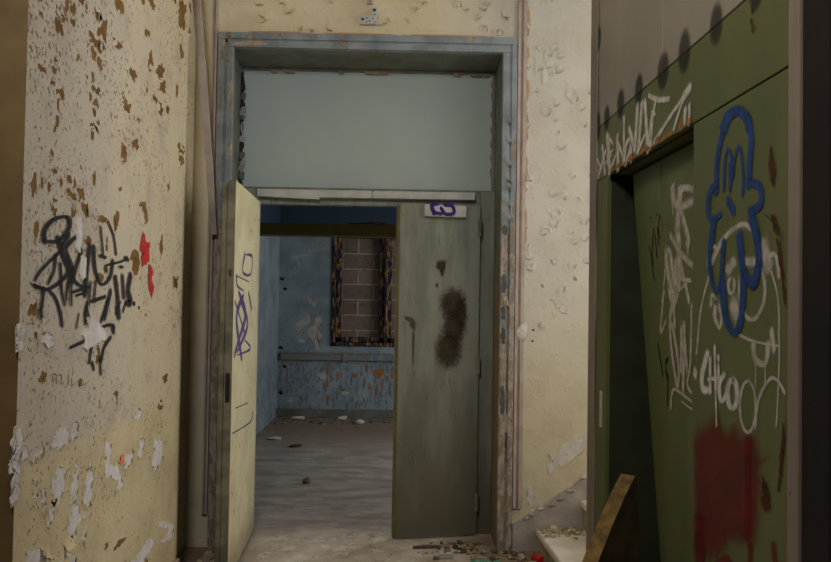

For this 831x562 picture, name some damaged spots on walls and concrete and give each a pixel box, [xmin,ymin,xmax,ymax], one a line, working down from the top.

peeling [36,0,123,143]
peeling [114,0,125,18]
peeling [127,26,179,117]
peeling [172,0,192,62]
peeling [120,135,140,165]
peeling [29,146,120,287]
peeling [15,299,55,353]
flaking render [81,316,106,366]
flaking render [8,415,80,508]
flaking render [104,396,164,499]
flaking render [546,430,587,477]
flaking render [25,456,94,562]